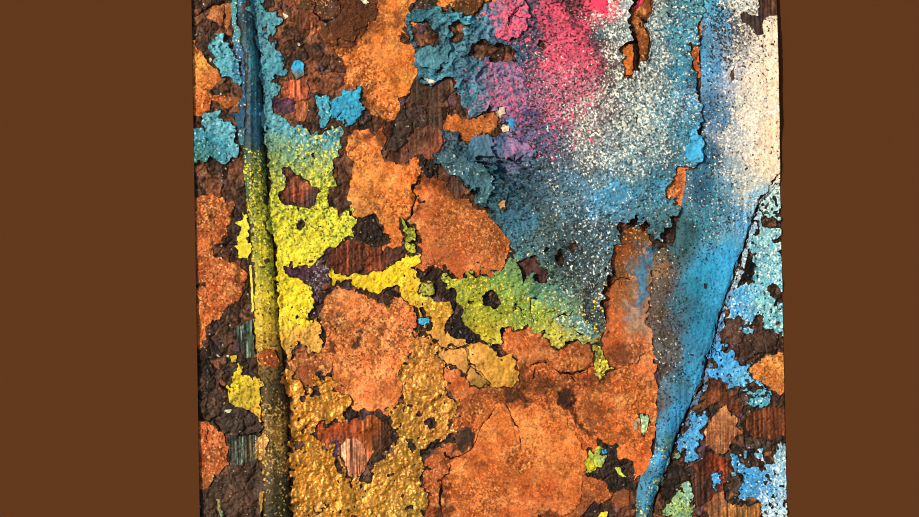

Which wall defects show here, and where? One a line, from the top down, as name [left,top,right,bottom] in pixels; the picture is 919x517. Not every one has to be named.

rust [195,192,248,348]
rust [295,0,511,343]
peeling [194,0,787,517]
rust [419,223,658,517]